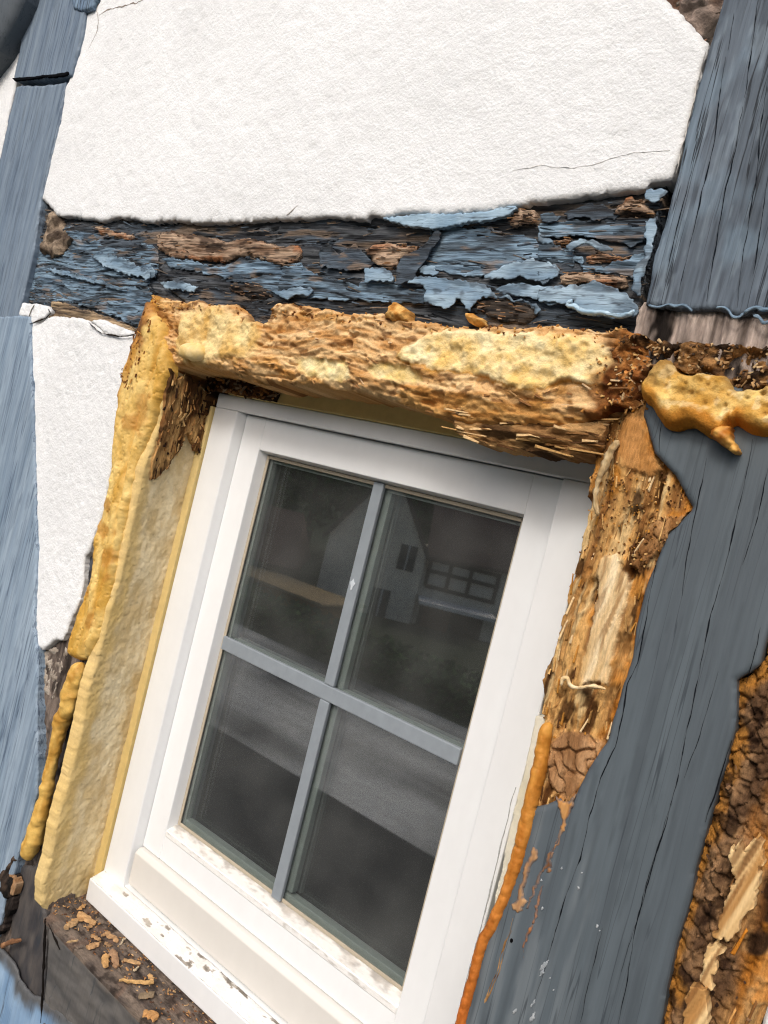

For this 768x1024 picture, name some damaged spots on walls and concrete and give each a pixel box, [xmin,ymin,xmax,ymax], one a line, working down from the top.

crack [518,0,768,306]
peeling [19,188,692,337]
peeling [716,305,768,325]
peeling [91,870,279,1024]